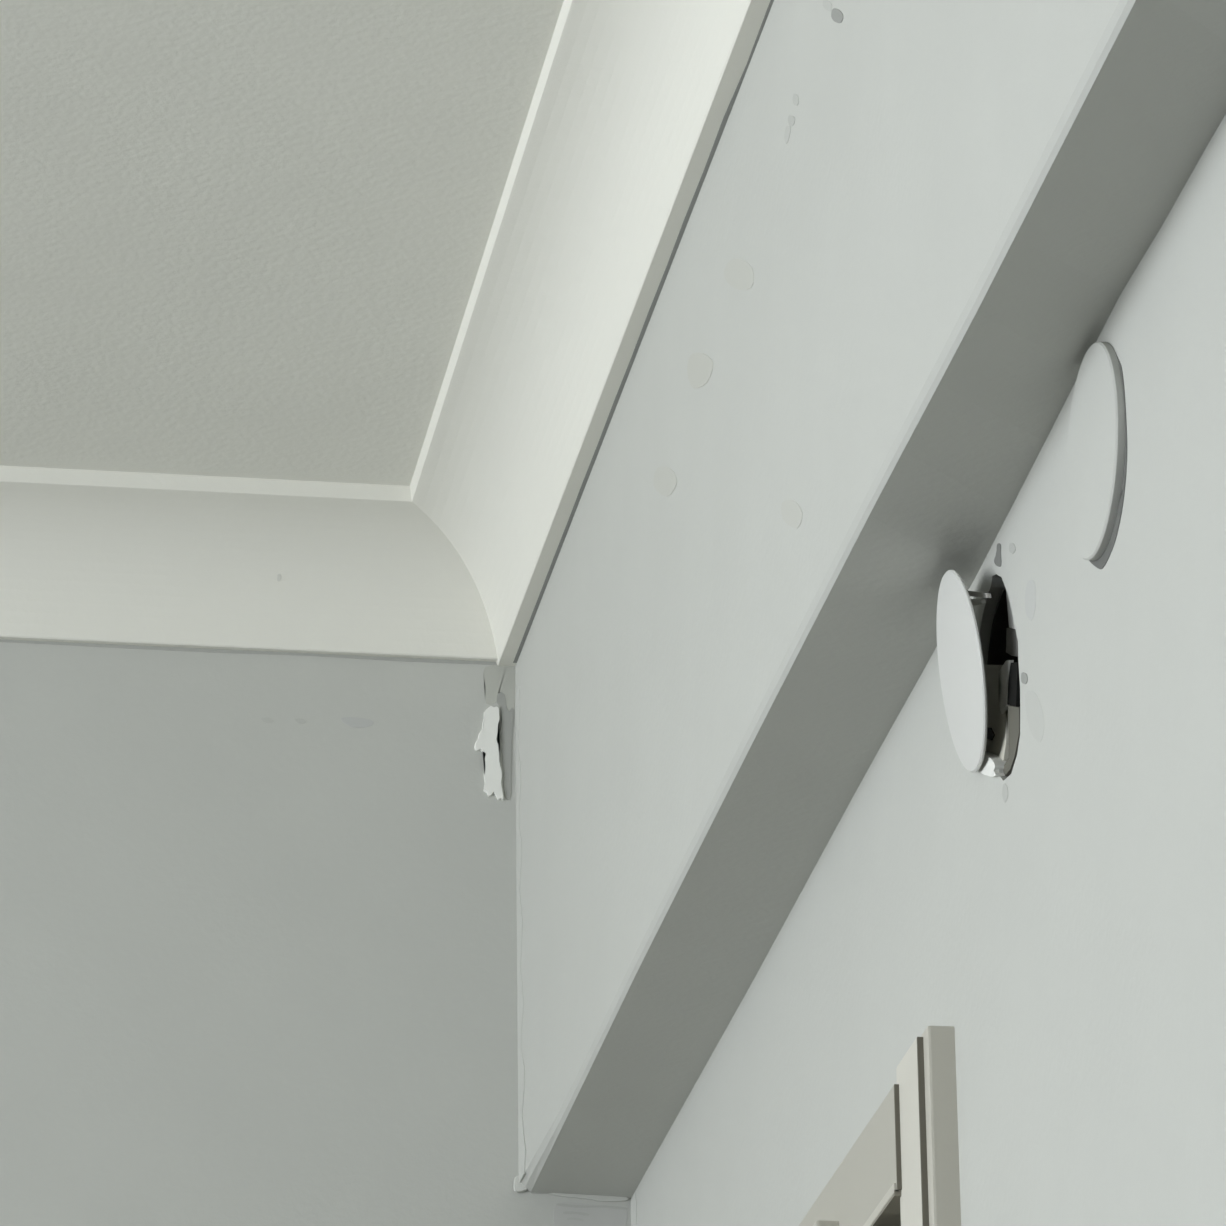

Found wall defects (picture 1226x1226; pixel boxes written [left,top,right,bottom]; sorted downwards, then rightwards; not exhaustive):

spalling [474,706,503,801]